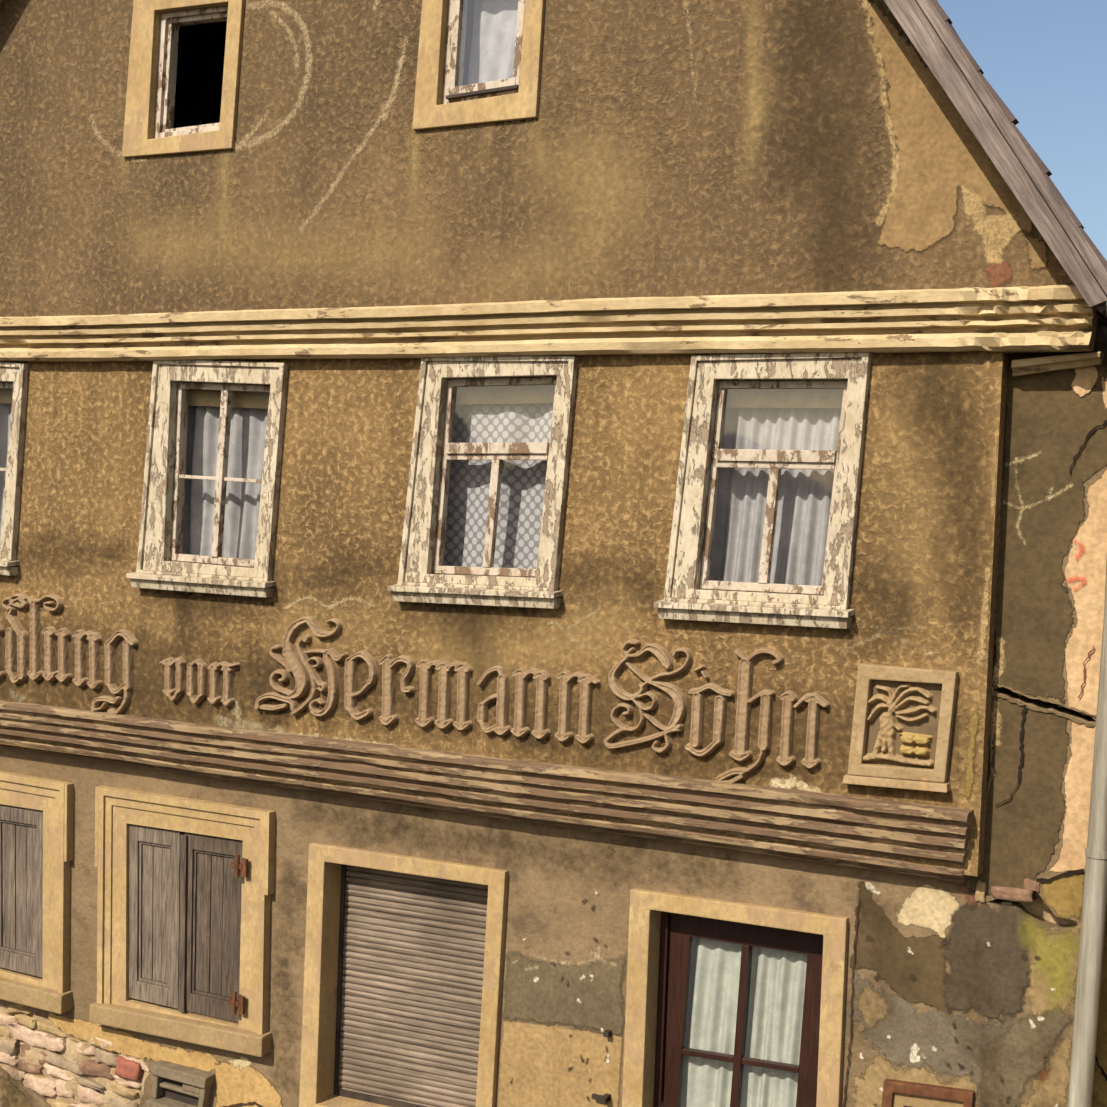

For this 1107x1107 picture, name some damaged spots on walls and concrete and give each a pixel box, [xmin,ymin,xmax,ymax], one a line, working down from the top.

flaking render [862,0,1048,288]
crack [1000,404,1107,544]
flaking render [849,341,1107,1050]
crack [986,611,1096,806]
leakage [1027,921,1079,999]
flaking render [0,1003,282,1107]
flaking render [851,1044,979,1107]
flaking render [1006,1035,1072,1107]